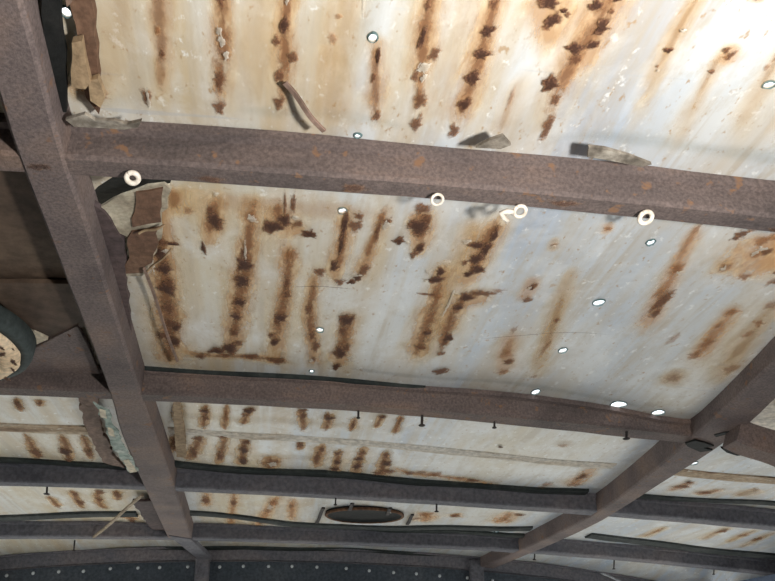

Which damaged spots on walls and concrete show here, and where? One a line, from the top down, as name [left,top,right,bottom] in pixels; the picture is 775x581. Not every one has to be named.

peeling [66,111,142,130]
rust [213,0,232,115]
rust [272,0,299,110]
rust [411,0,440,131]
rust [456,0,505,114]
rust [540,115,556,140]
rust [533,0,572,45]
rust [542,0,626,105]
rust [125,187,316,365]
rust [302,212,392,371]
rust [409,217,504,358]
rust [312,444,368,473]